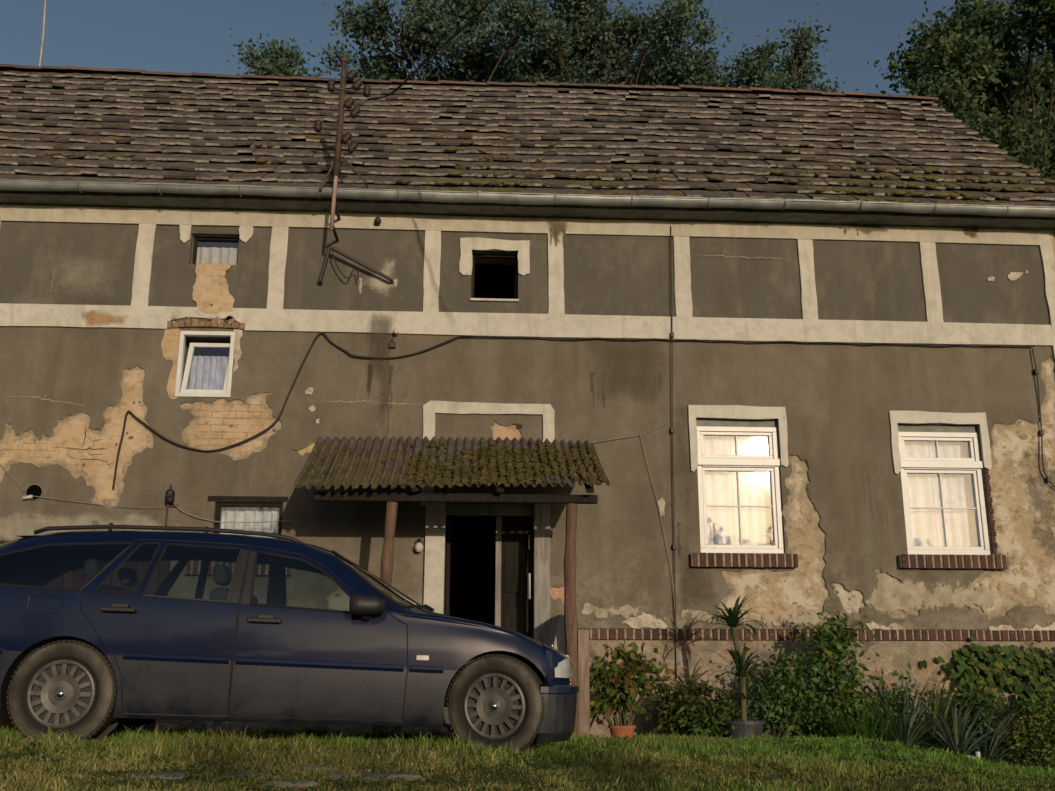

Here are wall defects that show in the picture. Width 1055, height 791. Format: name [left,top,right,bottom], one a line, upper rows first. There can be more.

flaking render [0,365,154,509]
flaking render [161,263,282,461]
flaking render [325,587,350,611]
spalling [490,421,522,441]
flaking render [550,585,577,604]
peeling [622,612,668,629]
flaking render [718,454,924,630]
flaking render [958,356,1055,630]